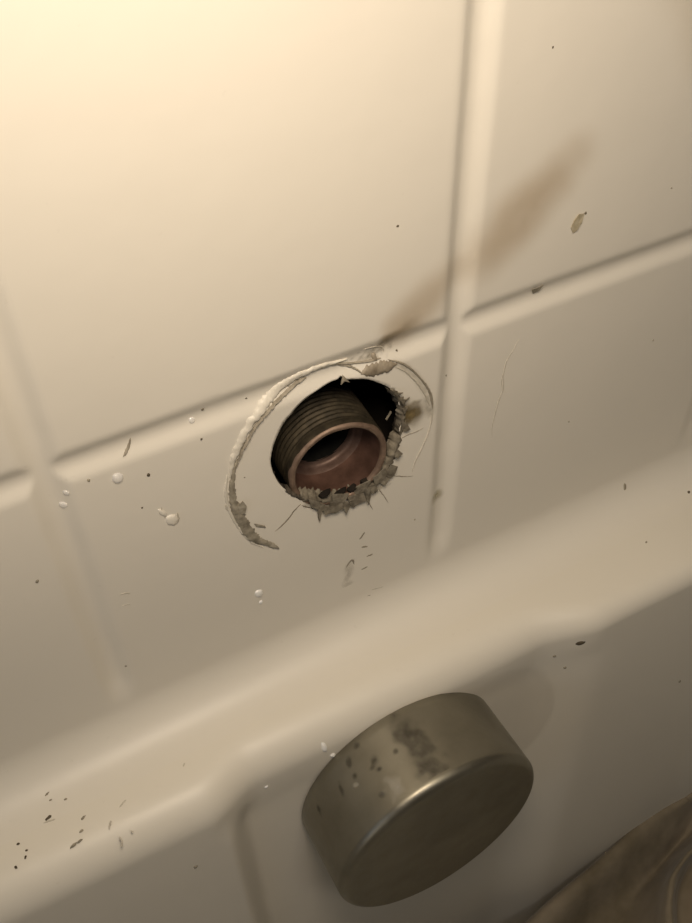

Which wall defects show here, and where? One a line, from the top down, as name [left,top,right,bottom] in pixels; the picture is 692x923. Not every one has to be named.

crack [276,504,319,531]
spalling [284,386,411,521]